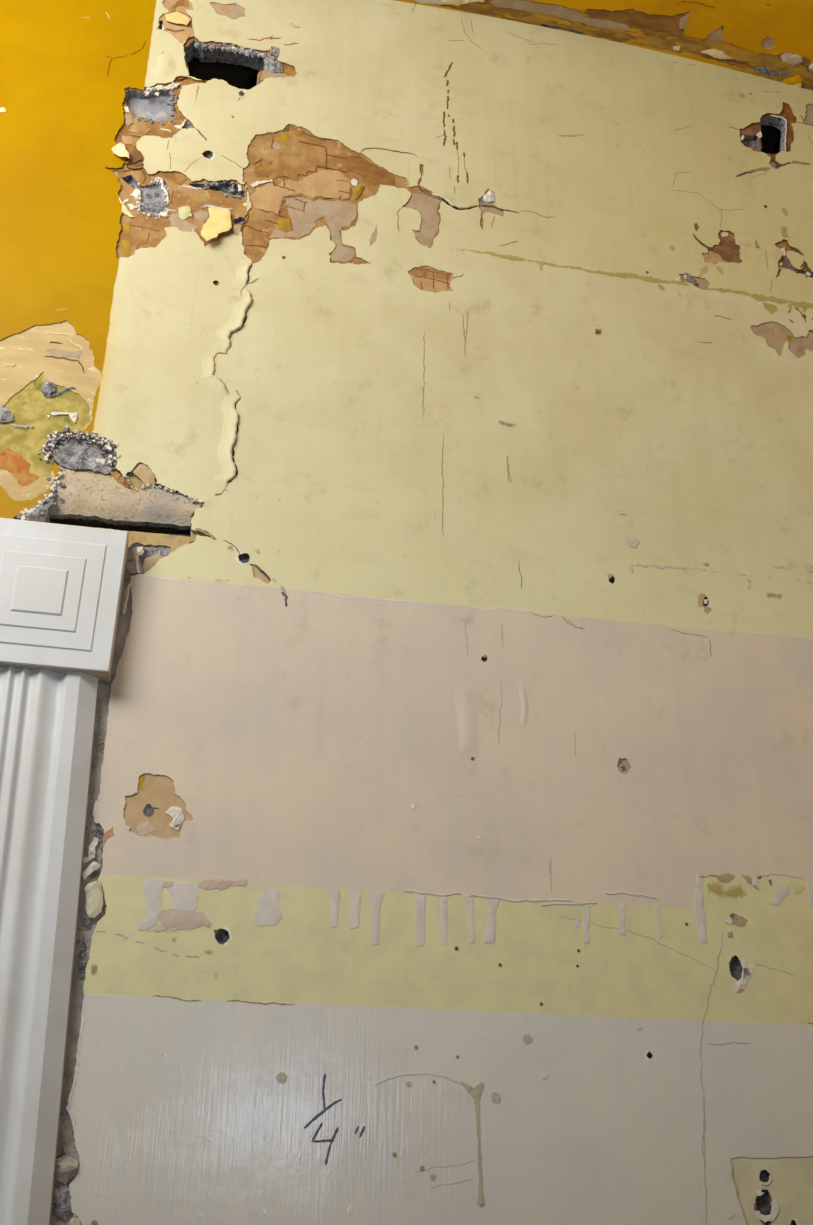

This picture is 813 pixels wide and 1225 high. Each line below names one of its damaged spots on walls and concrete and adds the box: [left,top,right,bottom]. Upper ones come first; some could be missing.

crack [201,259,257,495]
peeling [105,0,442,265]
peeling [408,265,453,293]
crack [418,187,552,218]
peeling [414,0,813,169]
peeling [675,223,743,290]
peeling [751,321,813,358]
peeling [0,320,271,584]
peeling [82,773,193,918]
spalling [214,927,233,946]
crack [559,916,751,1225]
spalling [753,1170,779,1225]